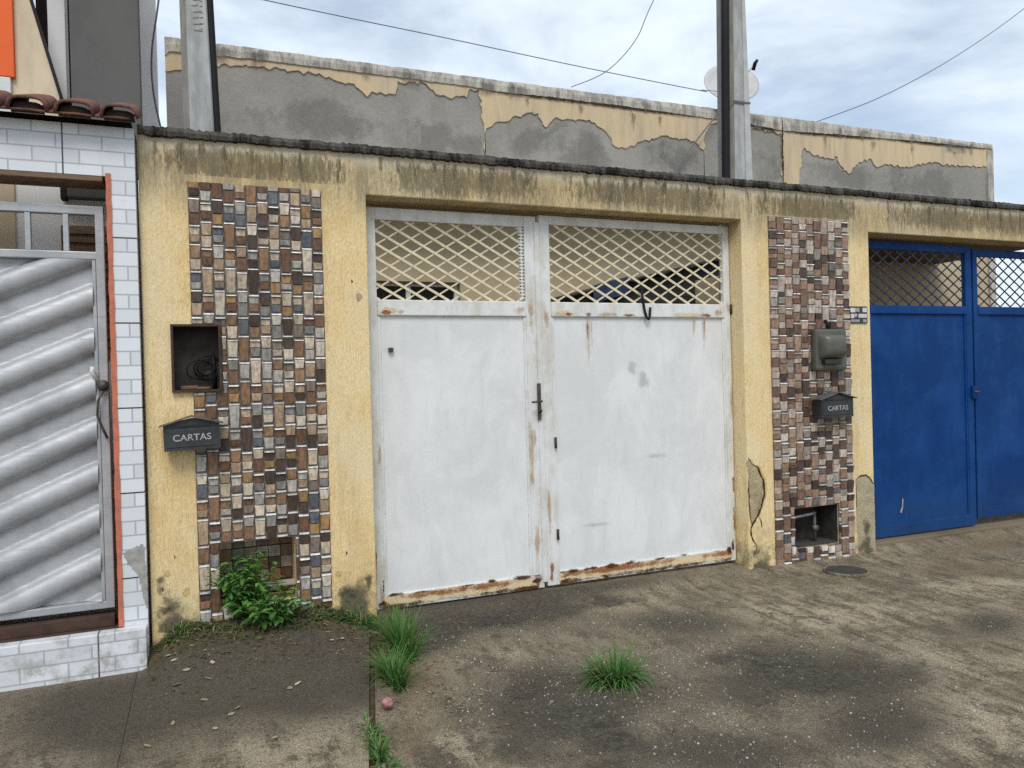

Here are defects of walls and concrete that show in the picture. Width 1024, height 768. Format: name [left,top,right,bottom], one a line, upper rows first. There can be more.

peeling [165,70,184,129]
peeling [217,63,718,177]
peeling [751,128,783,183]
peeling [799,148,987,201]
flaking render [747,458,767,551]
flaking render [856,474,876,553]
spalling [122,544,148,608]
leakage [158,577,186,632]
leakage [339,576,371,616]
rust [375,507,735,608]